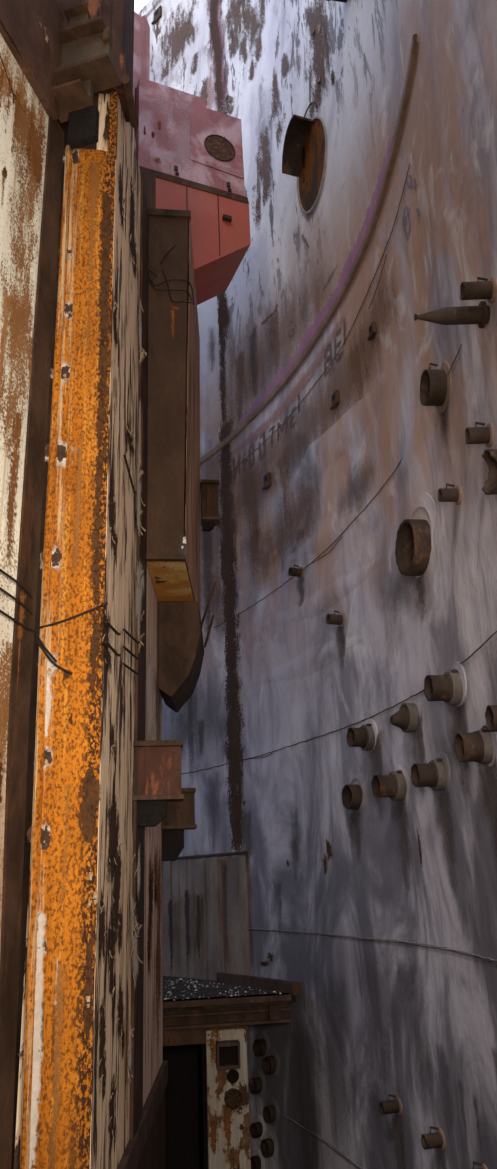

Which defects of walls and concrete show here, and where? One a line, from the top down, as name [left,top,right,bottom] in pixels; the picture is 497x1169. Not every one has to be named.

peeling [156,0,210,105]
peeling [225,0,268,81]
peeling [252,53,291,229]
peeling [303,0,335,122]
corrosion [0,45,47,565]
corrosion [72,162,117,700]
corrosion [0,591,27,815]
leakage [200,286,389,968]
corrosion [62,763,101,903]
corrosion [35,965,82,1169]
corrosion [82,925,95,1041]
leakage [168,890,202,969]